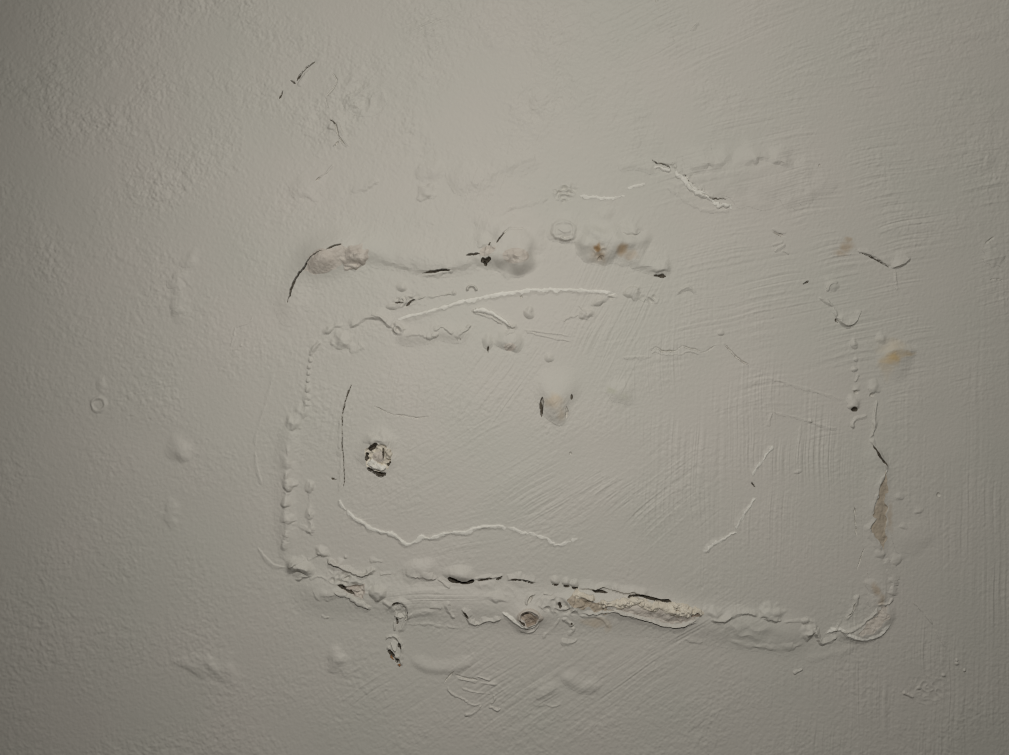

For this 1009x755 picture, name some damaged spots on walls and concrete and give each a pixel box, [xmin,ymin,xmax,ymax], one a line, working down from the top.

crack [287,244,341,302]
peeling [286,290,457,431]
peeling [472,307,517,335]
crack [331,386,351,491]
flaking render [847,339,889,551]
peeling [279,445,896,667]